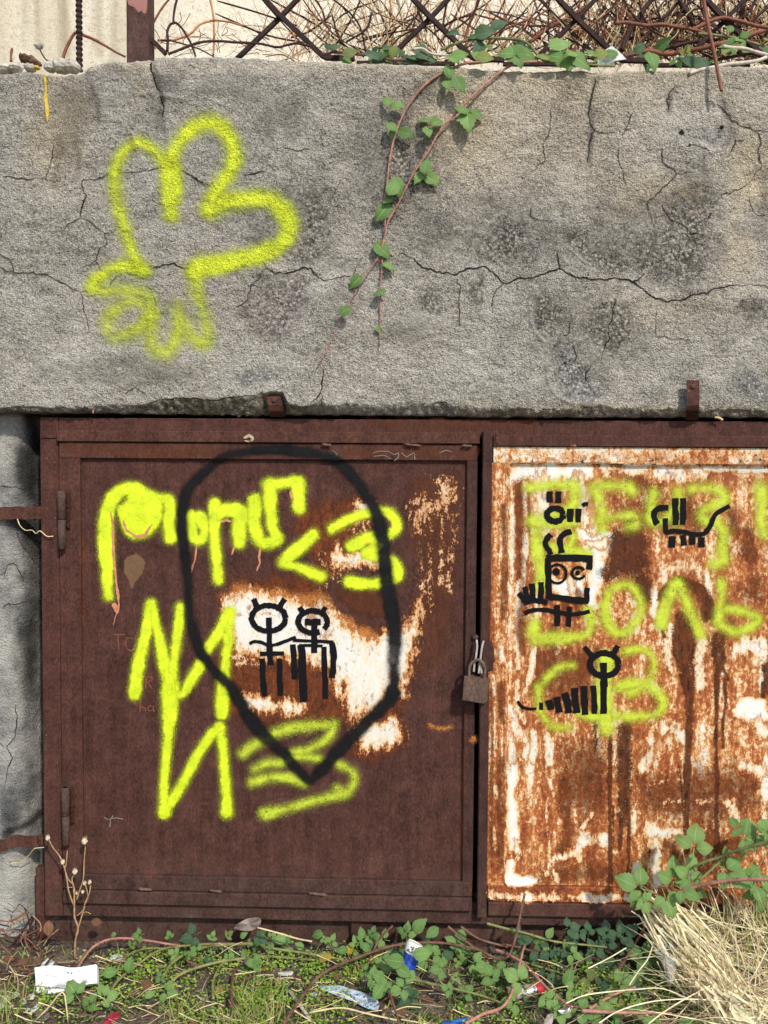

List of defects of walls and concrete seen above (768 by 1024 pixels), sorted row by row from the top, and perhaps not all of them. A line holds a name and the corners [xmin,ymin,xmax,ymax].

crack [150,61,165,117]
crack [587,78,768,266]
crack [0,166,213,339]
crack [238,261,366,307]
crack [401,253,767,385]
corrosion [220,497,389,643]
corrosion [212,640,407,763]
peeling [218,474,466,758]
corrosion [488,479,600,695]
peeling [486,445,768,905]
corrosion [598,475,709,603]
corrosion [635,760,760,858]